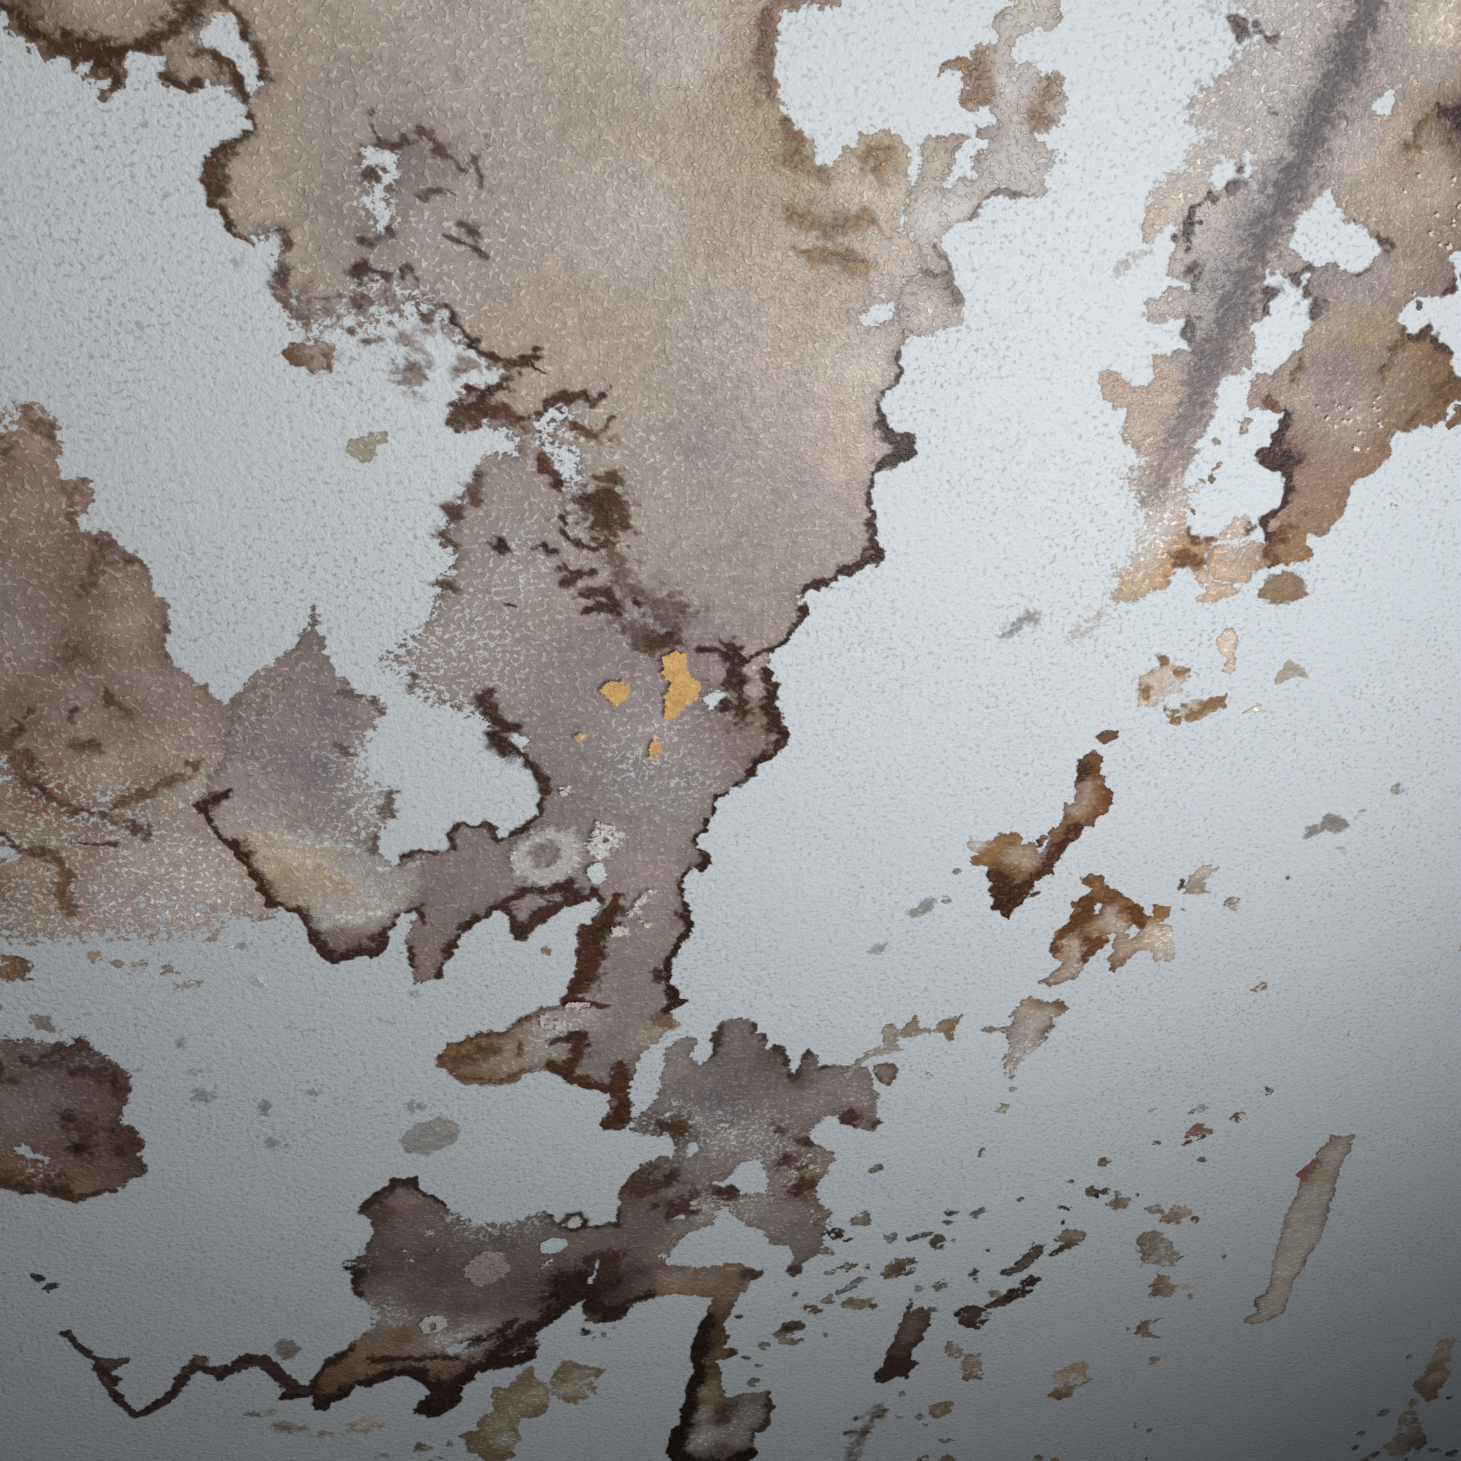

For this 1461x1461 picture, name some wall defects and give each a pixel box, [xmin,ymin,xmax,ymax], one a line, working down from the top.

water stain [1099,0,1461,604]
water stain [0,0,1069,1461]
water stain [1096,730,1119,745]